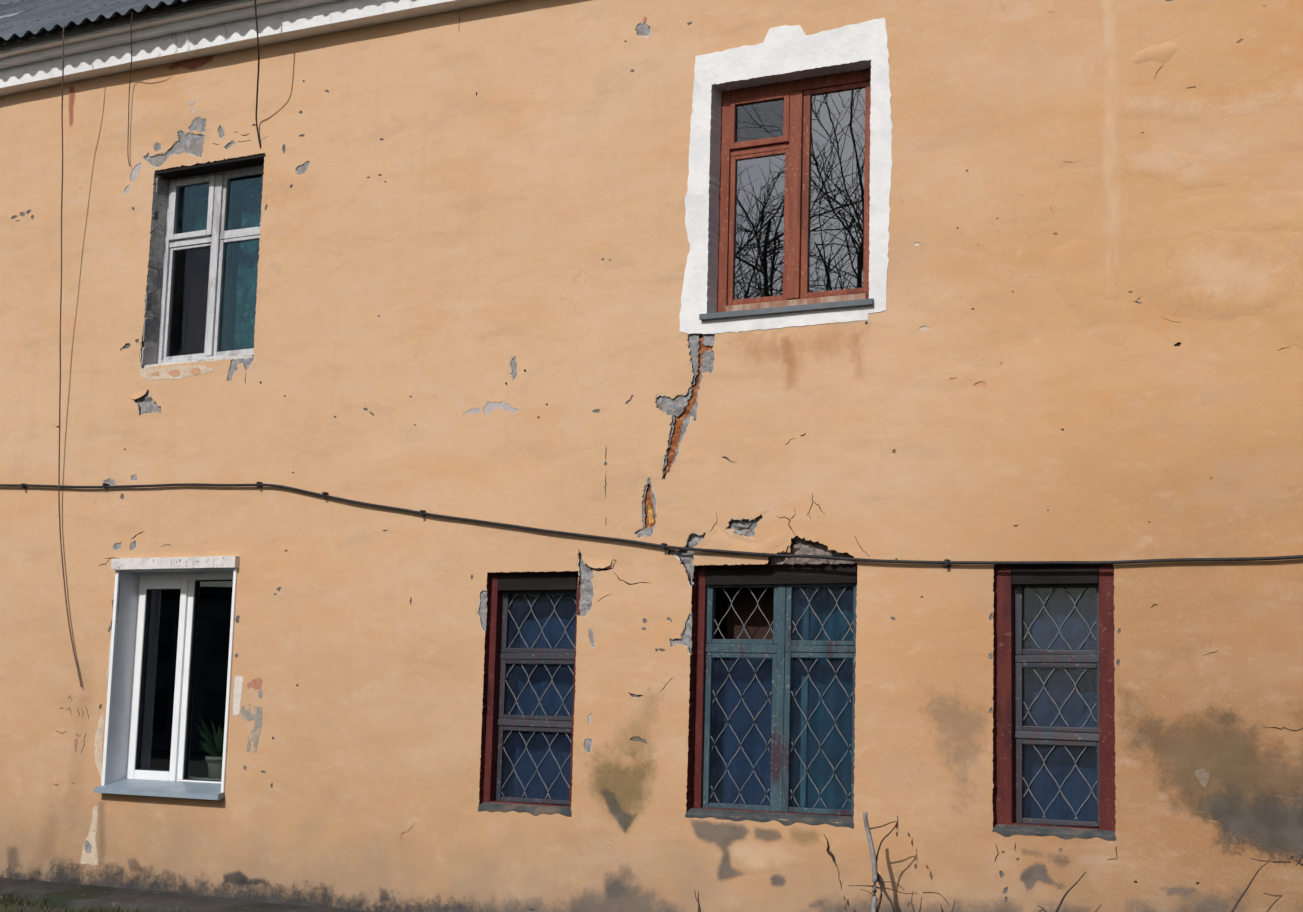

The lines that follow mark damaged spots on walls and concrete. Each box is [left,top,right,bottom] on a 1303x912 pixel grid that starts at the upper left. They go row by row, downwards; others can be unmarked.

flaking render [124,99,268,233]
flaking render [290,161,309,188]
peeling [120,268,262,415]
flaking render [505,356,526,385]
crack [635,333,715,540]
flaking render [576,547,617,649]
flaking render [667,510,856,588]
water stain [594,761,651,832]
water stain [1130,709,1303,859]
water stain [0,805,674,912]
water stain [692,820,804,885]
water stain [982,843,1053,912]